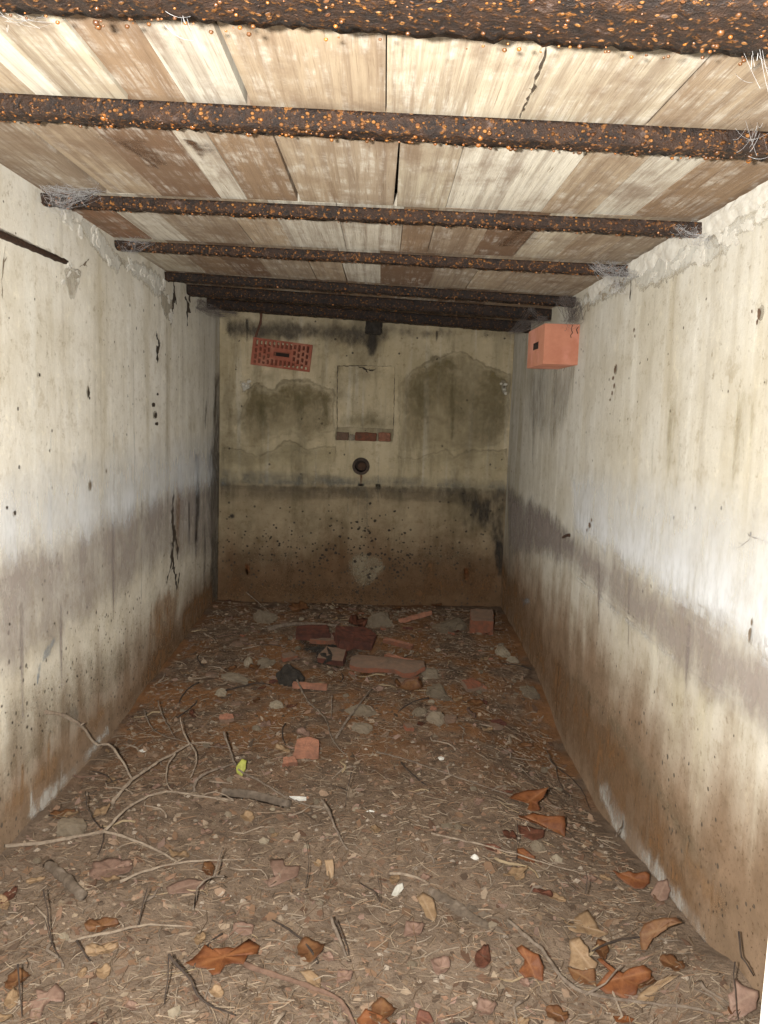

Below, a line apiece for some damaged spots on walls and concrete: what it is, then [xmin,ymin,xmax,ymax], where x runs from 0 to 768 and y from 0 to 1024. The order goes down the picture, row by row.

crack [519,47,546,118]
water stain [79,377,228,685]
crack [166,488,180,589]
water stain [0,555,61,674]
water stain [438,488,768,719]